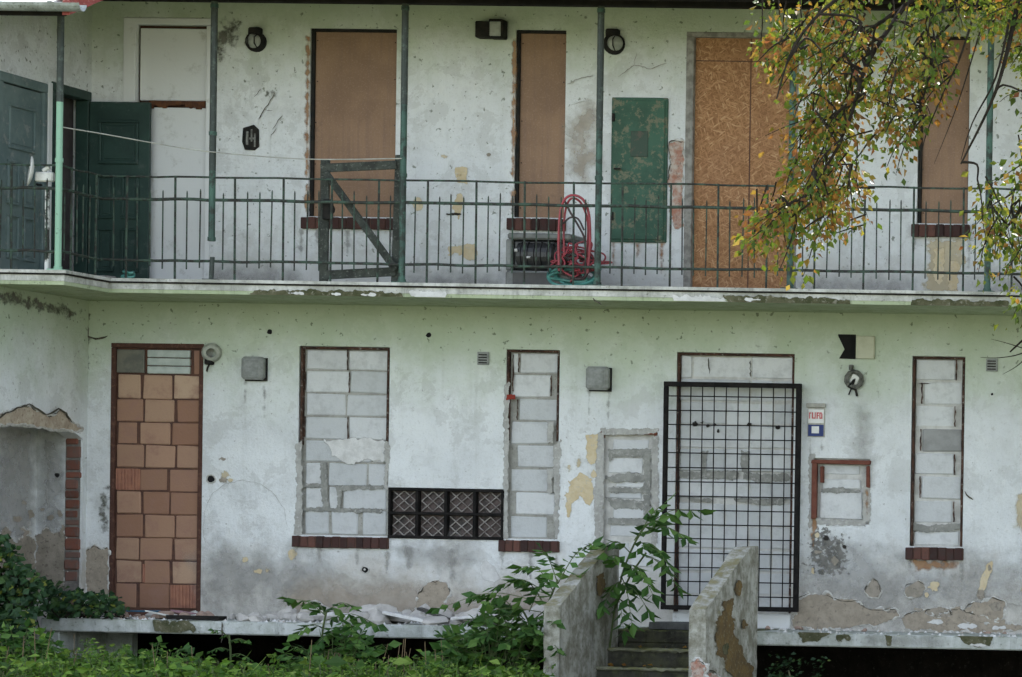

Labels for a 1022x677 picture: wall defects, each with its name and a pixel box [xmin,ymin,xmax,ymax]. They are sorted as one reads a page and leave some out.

spalling [667,138,685,230]
water stain [0,292,76,317]
spalling [0,404,84,433]
peeling [564,434,598,517]
peeling [0,500,69,595]
spalling [85,544,111,601]
spalling [414,579,452,610]
peeling [690,580,755,677]
spalling [791,561,1022,648]